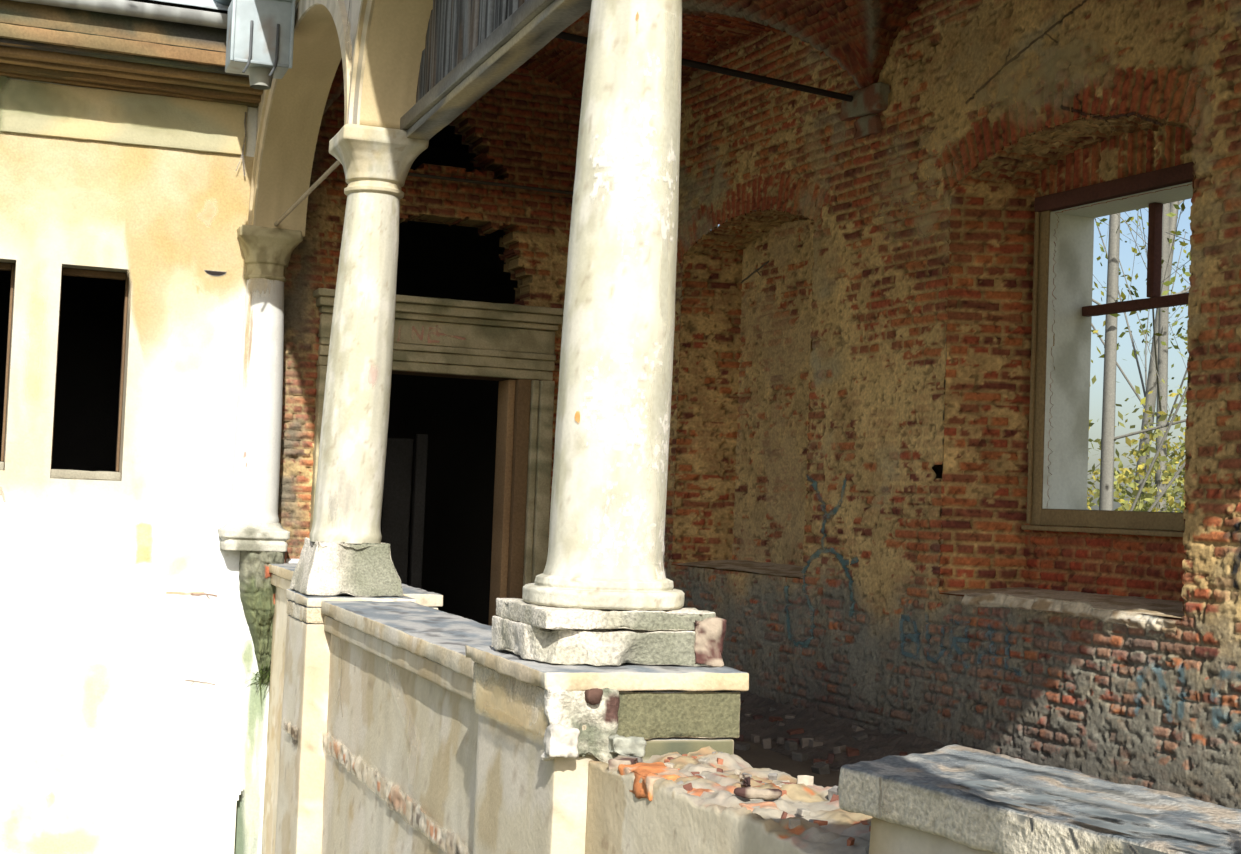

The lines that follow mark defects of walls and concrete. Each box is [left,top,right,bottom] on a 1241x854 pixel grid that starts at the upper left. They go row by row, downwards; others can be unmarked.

damp [0,114,270,377]
peeling [584,27,679,580]
peeling [135,522,153,564]
spalling [961,594,1177,634]
damp [242,641,253,683]
spalling [541,686,647,763]